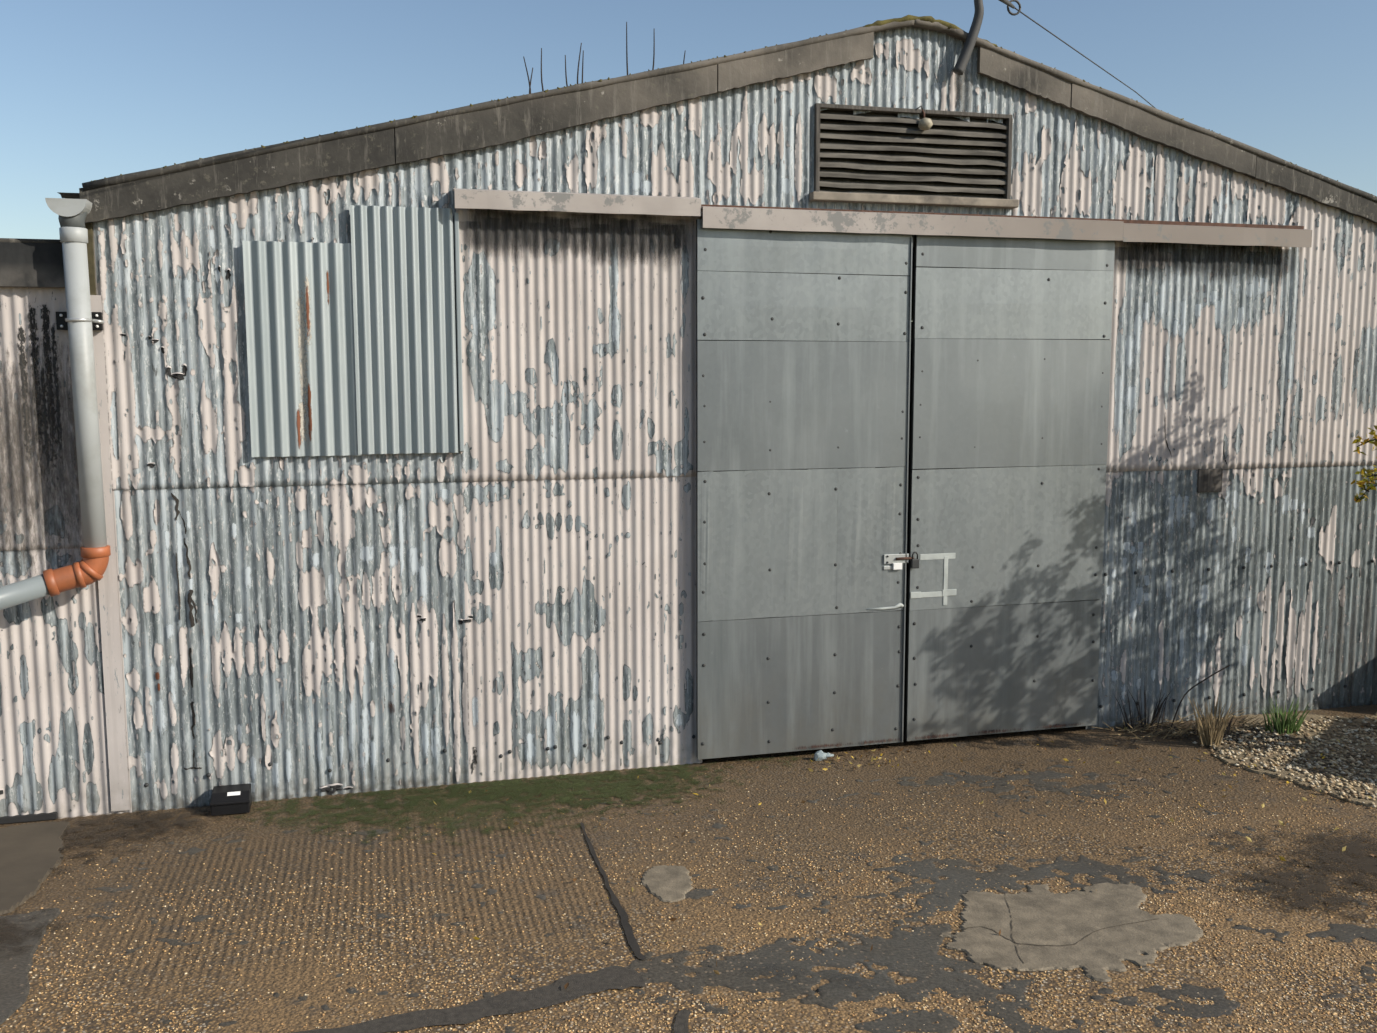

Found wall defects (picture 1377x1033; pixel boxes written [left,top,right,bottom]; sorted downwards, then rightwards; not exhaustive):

peeling [275,156,460,243]
damp [17,303,63,491]
damp [165,511,193,590]
rust [297,384,312,448]
peeling [98,191,693,807]
peeling [468,38,1377,722]
damp [1114,242,1287,436]
peeling [1303,961,1377,1006]